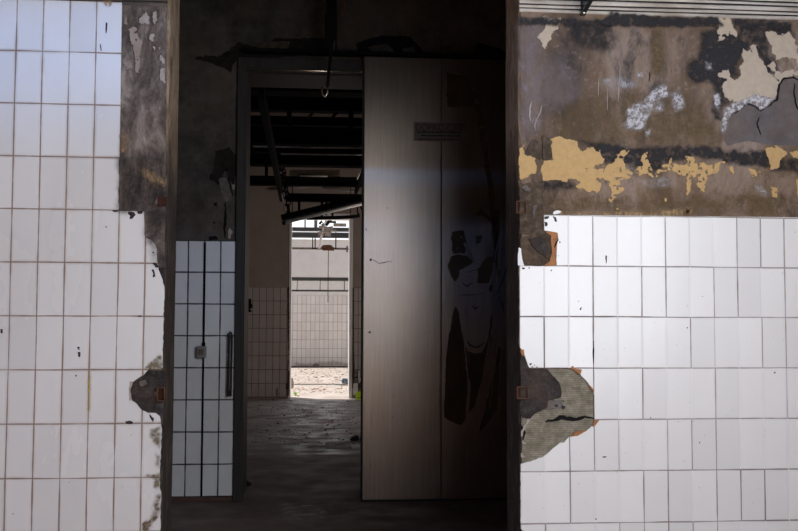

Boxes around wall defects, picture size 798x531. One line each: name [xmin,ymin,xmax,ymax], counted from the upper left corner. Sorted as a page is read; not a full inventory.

flaking render [112,5,168,289]
peeling [537,16,561,49]
water stain [544,181,573,190]
peeling [518,135,734,271]
water stain [551,191,764,216]
water stain [518,12,798,172]
peeling [717,18,737,41]
flaking render [718,31,798,177]
spalling [129,324,165,531]
spalling [520,349,599,463]